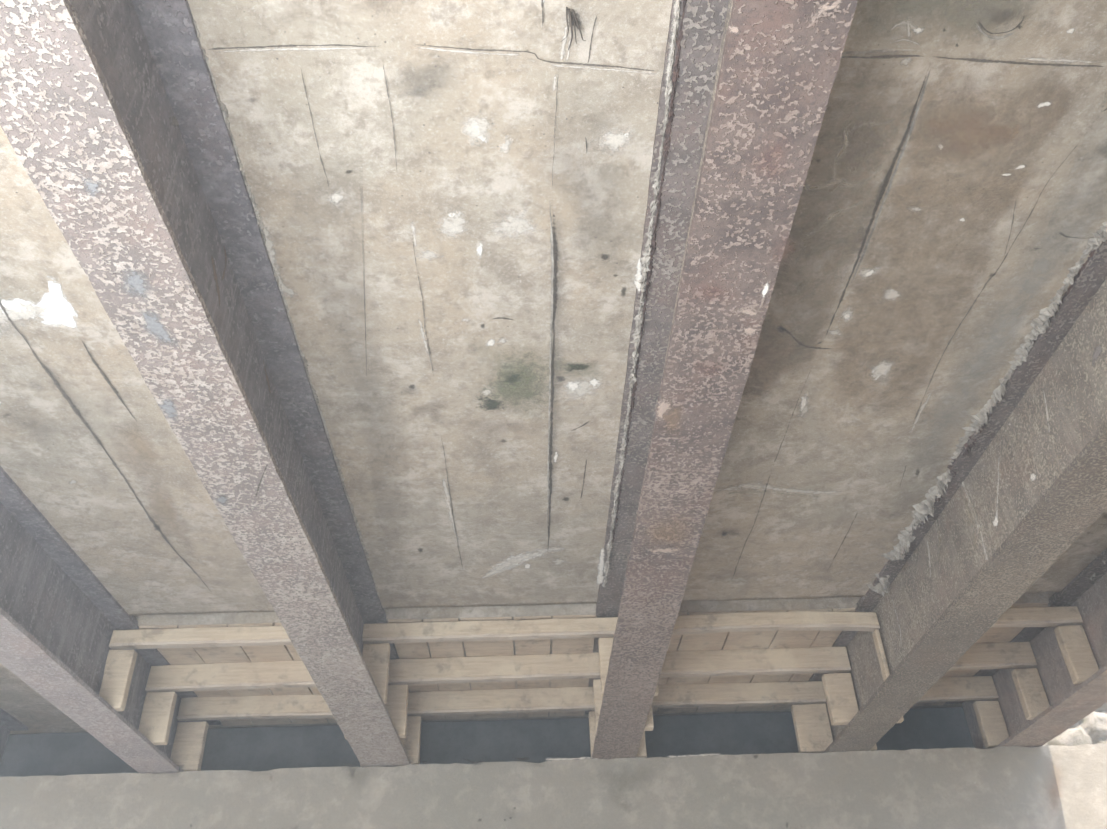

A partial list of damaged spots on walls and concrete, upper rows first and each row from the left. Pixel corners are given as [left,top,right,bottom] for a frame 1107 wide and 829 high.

crack [383,66,397,169]
crack [411,225,433,370]
crack [0,301,209,589]
crack [442,443,462,565]